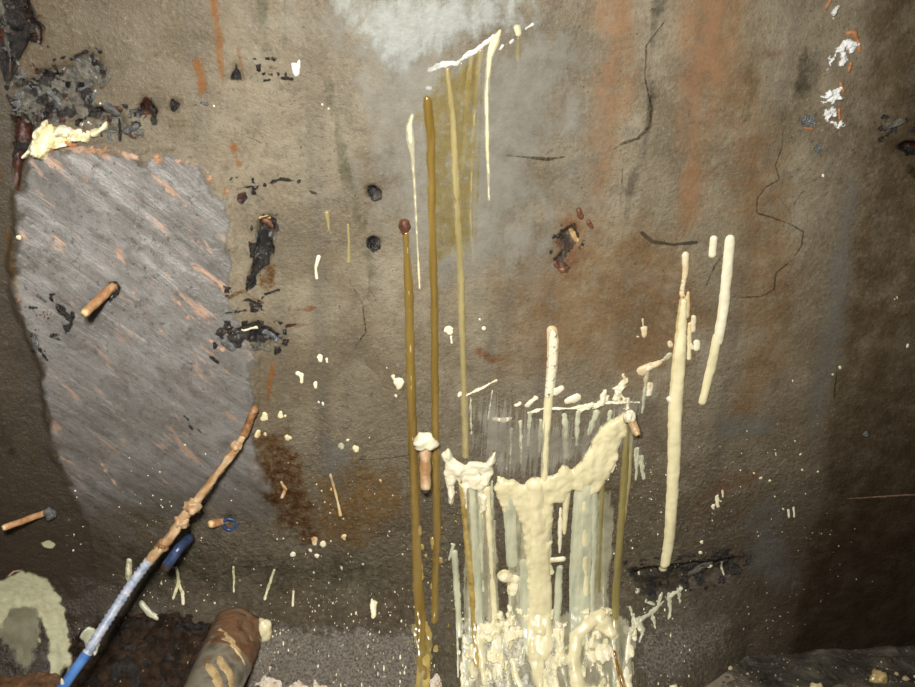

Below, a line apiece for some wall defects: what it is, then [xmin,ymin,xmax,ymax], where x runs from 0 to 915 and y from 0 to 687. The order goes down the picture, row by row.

damp [353,0,498,64]
damp [828,30,861,73]
spalling [0,0,158,190]
damp [820,82,845,129]
spalling [237,177,311,204]
damp [427,23,535,459]
spalling [29,334,49,361]
spalling [28,293,75,340]
spalling [209,214,296,364]
damp [406,86,441,624]